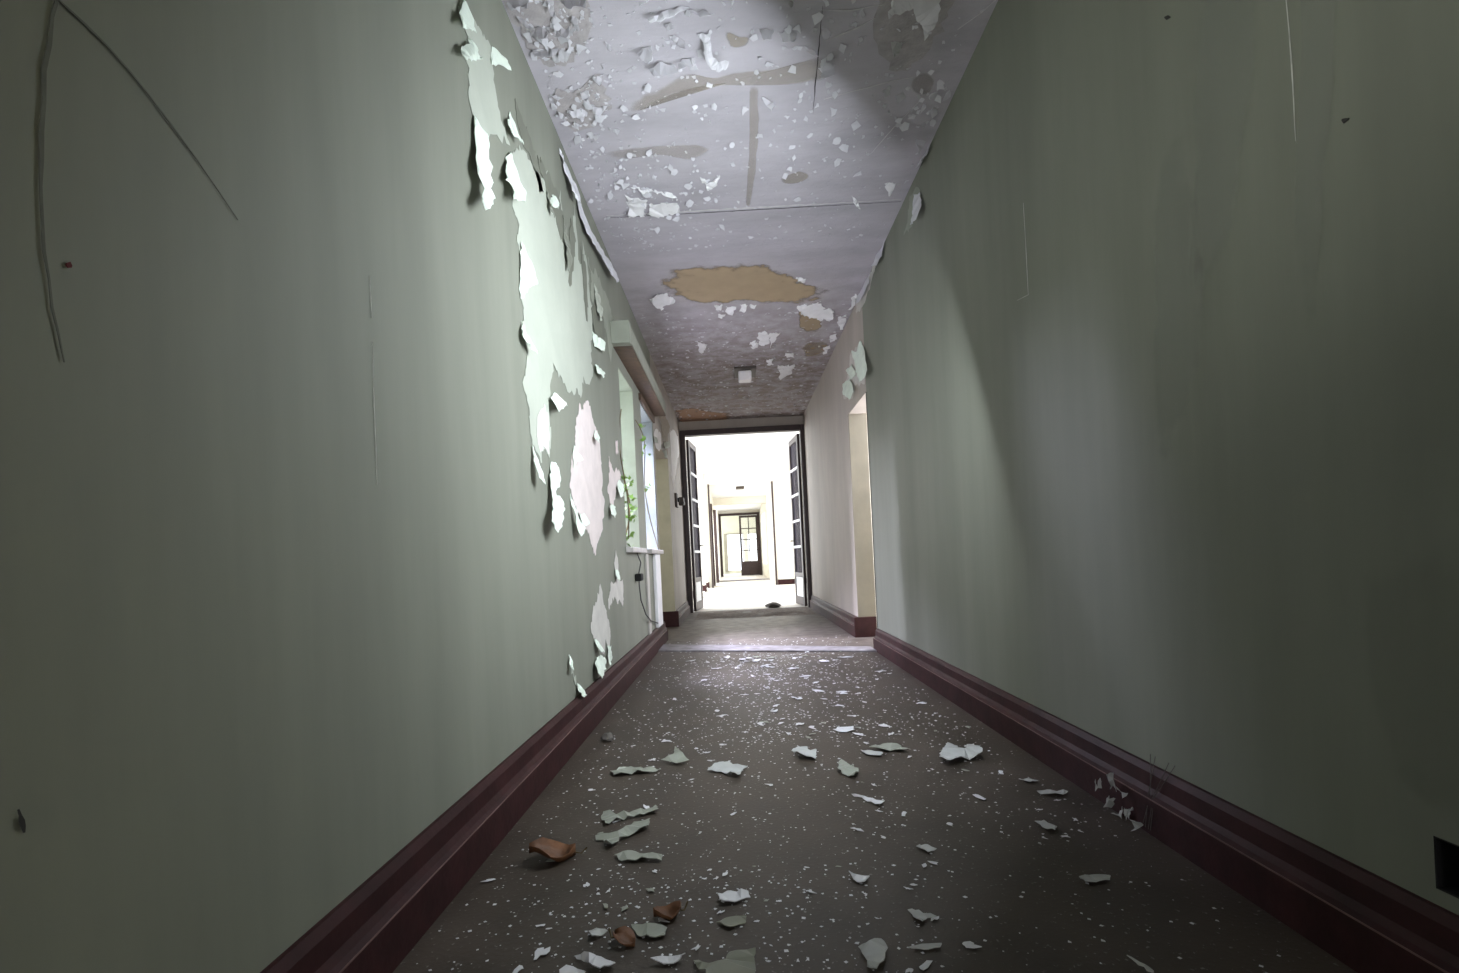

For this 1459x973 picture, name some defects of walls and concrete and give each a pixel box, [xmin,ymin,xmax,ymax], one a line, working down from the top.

peeling [648,6,729,72]
crack [38,0,238,362]
peeling [625,187,680,218]
peeling [885,182,922,234]
peeling [458,0,624,555]
peeling [649,293,675,311]
peeling [714,304,756,319]
leakage [663,265,821,331]
peeling [797,240,885,355]
peeling [749,331,795,380]
peeling [842,341,867,400]
peeling [591,551,624,678]